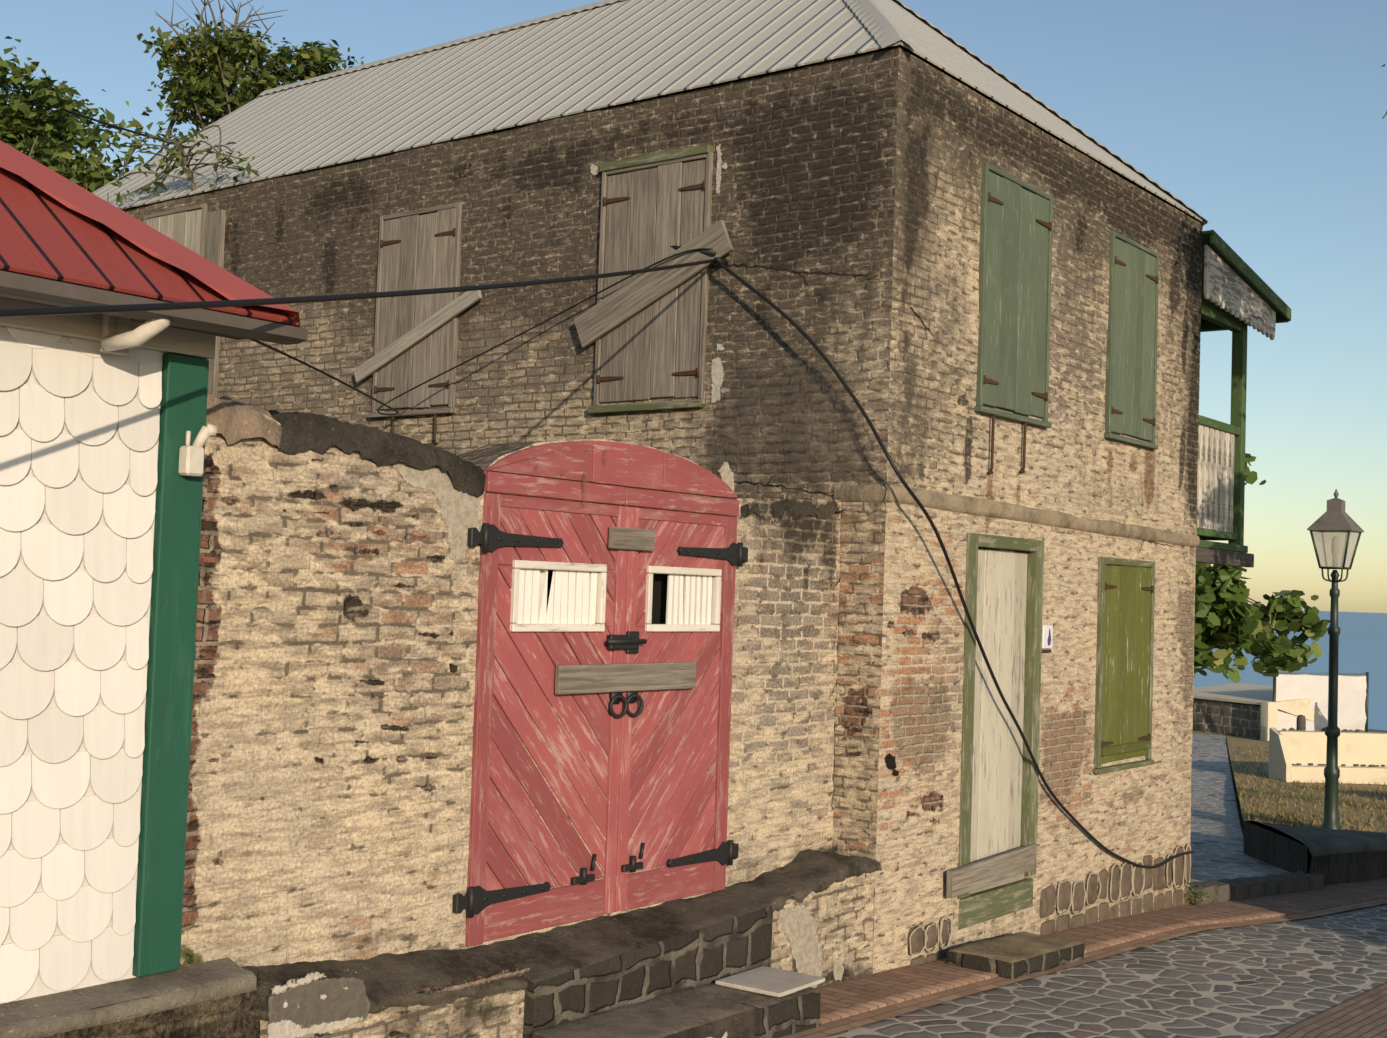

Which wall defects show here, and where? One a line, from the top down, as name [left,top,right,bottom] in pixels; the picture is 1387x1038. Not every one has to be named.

leakage [305,174,374,292]
leakage [449,67,1203,523]
spalling [887,582,940,642]
spalling [182,453,240,933]
spalling [840,686,872,758]
spalling [885,753,899,776]
spalling [907,789,944,824]
flaking render [777,892,844,988]
peeling [267,972,363,1038]